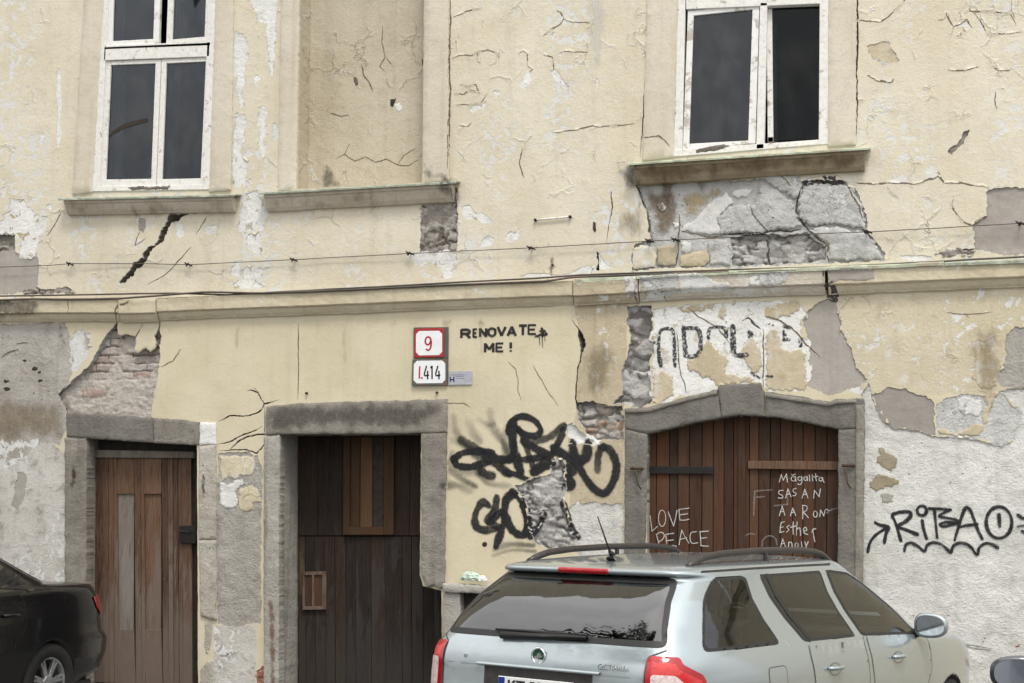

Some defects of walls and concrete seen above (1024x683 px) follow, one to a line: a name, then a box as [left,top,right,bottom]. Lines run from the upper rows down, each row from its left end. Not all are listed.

peeling [232,0,279,254]
crack [447,1,589,167]
crack [854,0,906,136]
crack [940,0,1019,36]
crack [114,214,187,321]
flaking render [408,188,520,279]
peeling [0,322,162,511]
crack [220,324,299,454]
crack [508,321,586,410]
peeling [567,179,1024,683]
peeling [217,450,263,627]
flaking render [516,458,624,556]